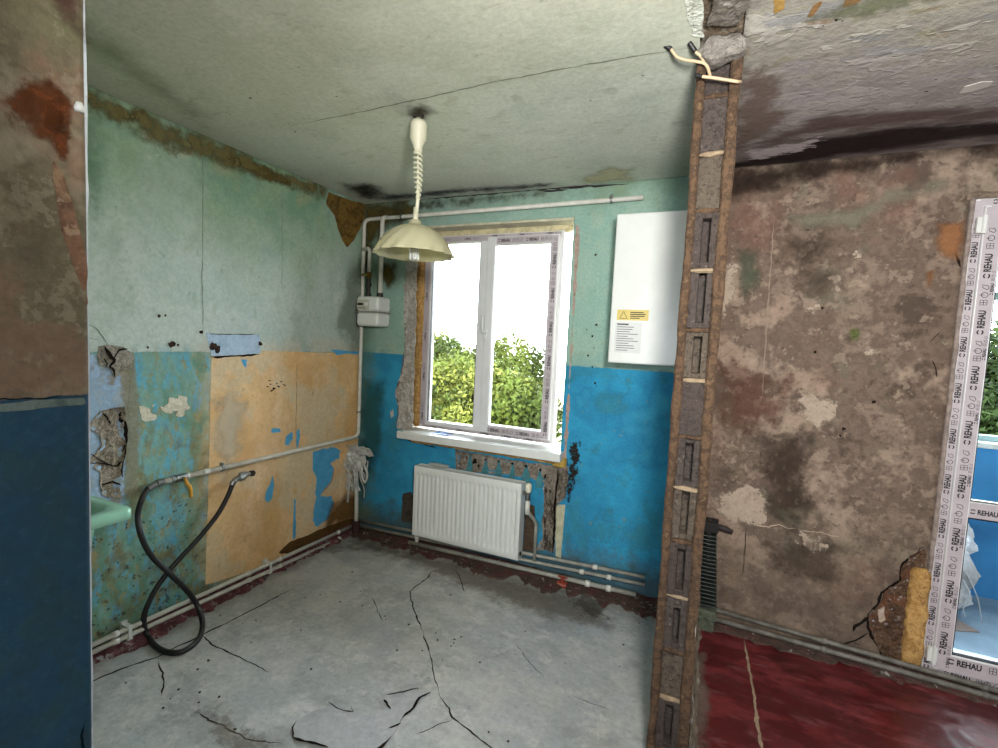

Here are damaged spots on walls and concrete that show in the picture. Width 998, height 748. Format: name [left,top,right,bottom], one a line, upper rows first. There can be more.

peeling [773,0,785,13]
corrosion [5,79,72,159]
damp [731,71,998,196]
crack [0,394,69,402]
spalling [97,345,134,378]
spalling [90,407,128,498]
spalling [455,450,569,551]
flaking render [713,484,769,526]
spalling [866,547,927,660]
crack [409,571,492,748]
crack [198,712,278,743]